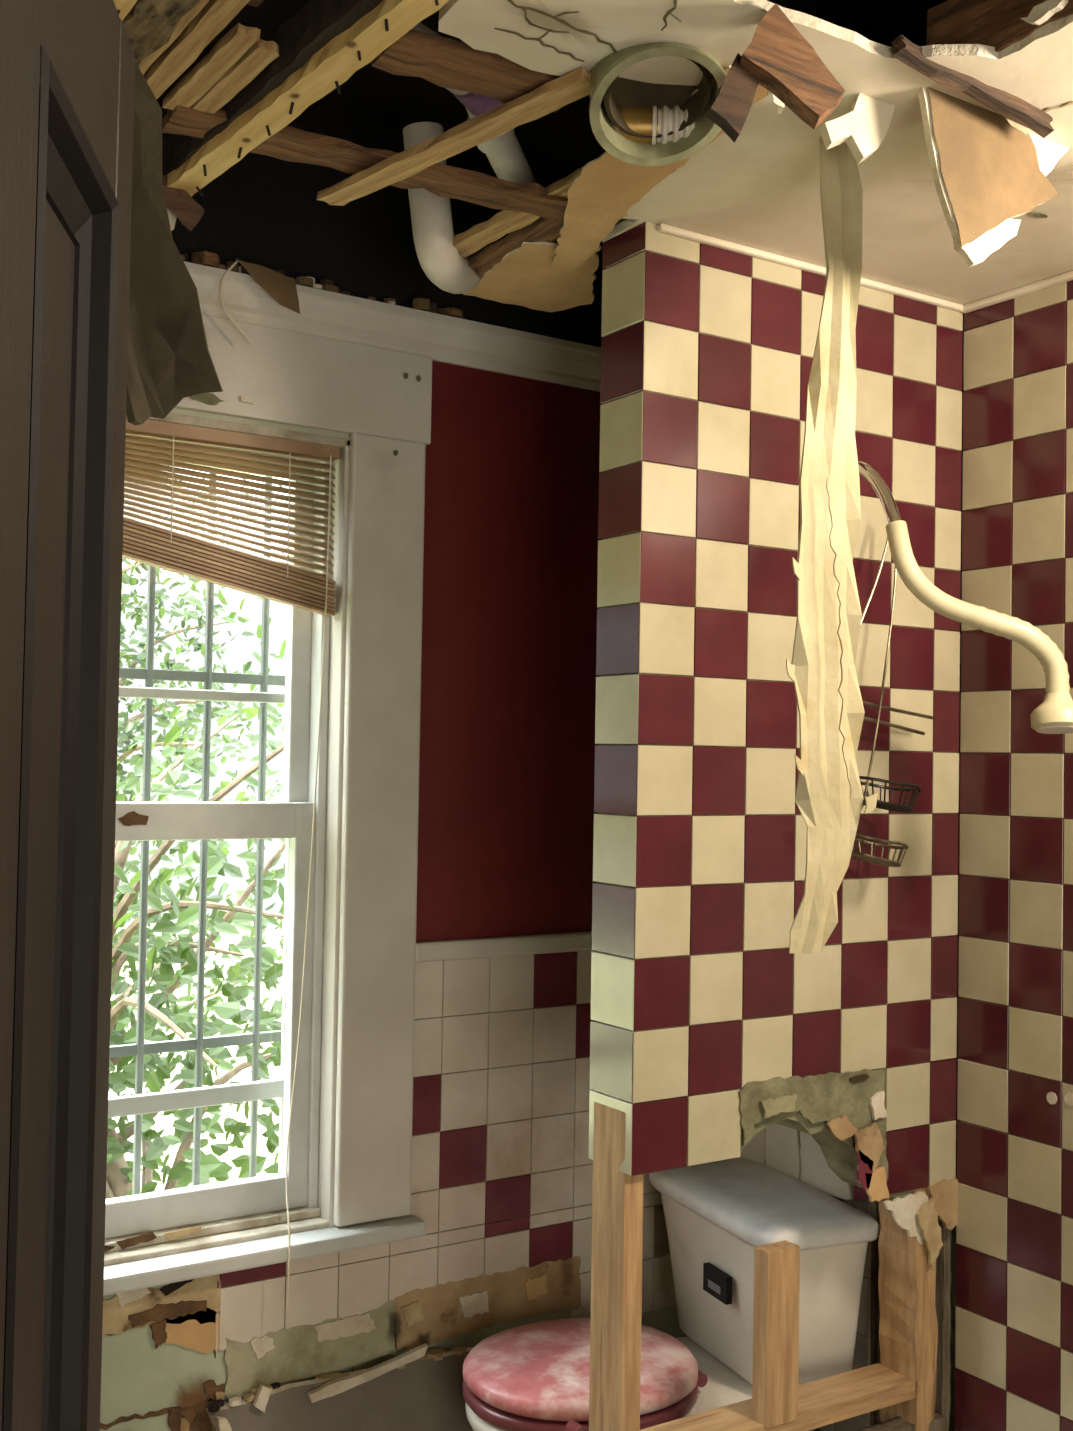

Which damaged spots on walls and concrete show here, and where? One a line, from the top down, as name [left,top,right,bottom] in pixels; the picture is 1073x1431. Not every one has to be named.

crack [495,0,617,62]
crack [661,0,681,31]
flaking render [167,208,177,231]
flaking render [738,1069,959,1265]
flaking render [102,1256,582,1431]